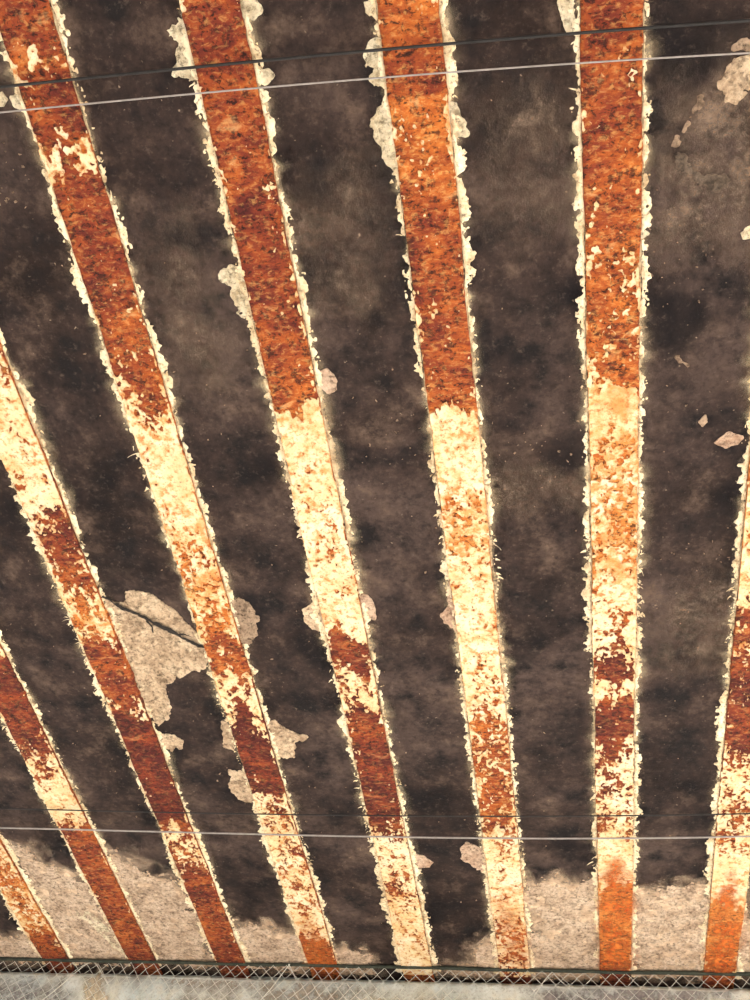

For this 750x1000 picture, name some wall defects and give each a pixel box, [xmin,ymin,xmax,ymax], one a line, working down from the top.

peeling [0,0,376,977]
peeling [167,0,750,984]
crack [101,596,204,648]
rust [598,860,634,968]
rust [708,885,739,968]
damp [0,977,70,1000]
damp [164,978,352,1000]
damp [542,989,729,1000]